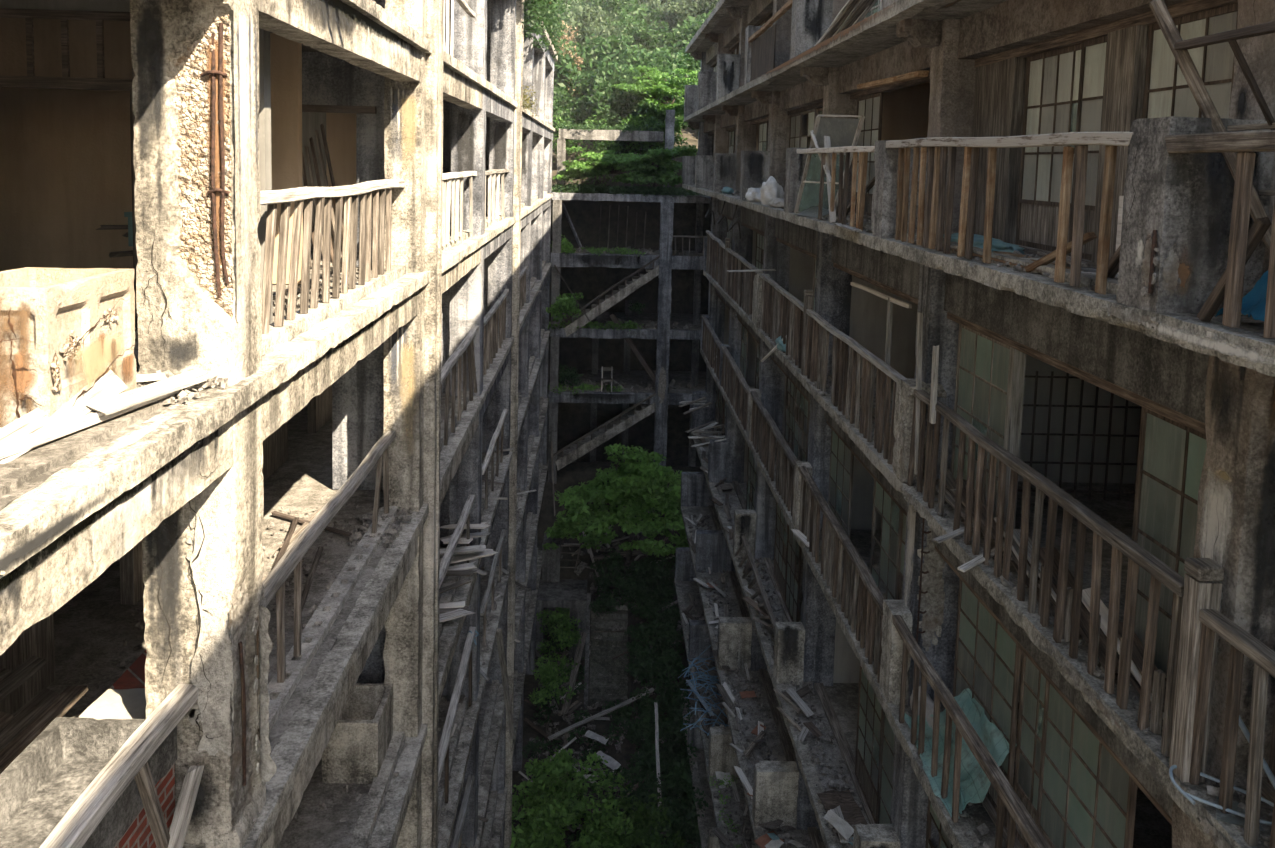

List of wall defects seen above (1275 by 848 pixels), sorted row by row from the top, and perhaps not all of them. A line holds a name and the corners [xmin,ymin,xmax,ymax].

water stain [137,3,164,155]
water stain [806,0,822,41]
corrosion [207,43,225,271]
crack [0,231,172,418]
water stain [164,336,197,370]